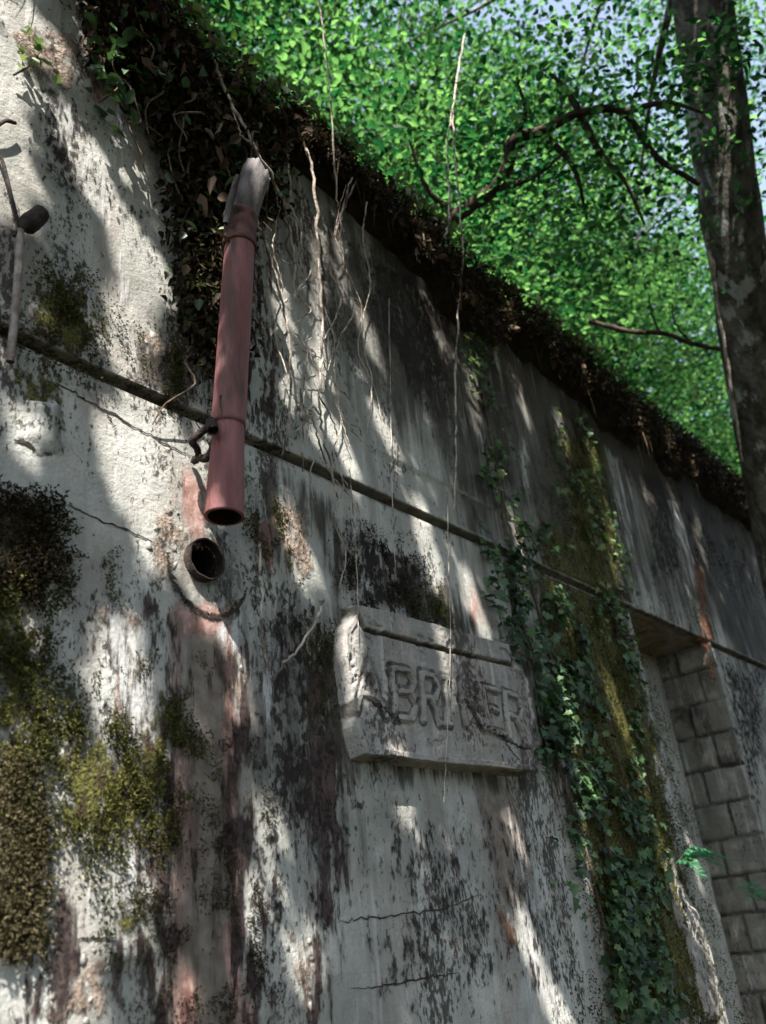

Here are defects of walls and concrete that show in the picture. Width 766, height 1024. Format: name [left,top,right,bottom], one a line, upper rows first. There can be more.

crack [57,382,190,456]
crack [61,502,248,620]
water stain [334,516,343,570]
rust [691,565,716,683]
water stain [301,664,349,1024]
crack [337,894,479,941]
water stain [461,772,556,1012]
crack [351,972,458,989]